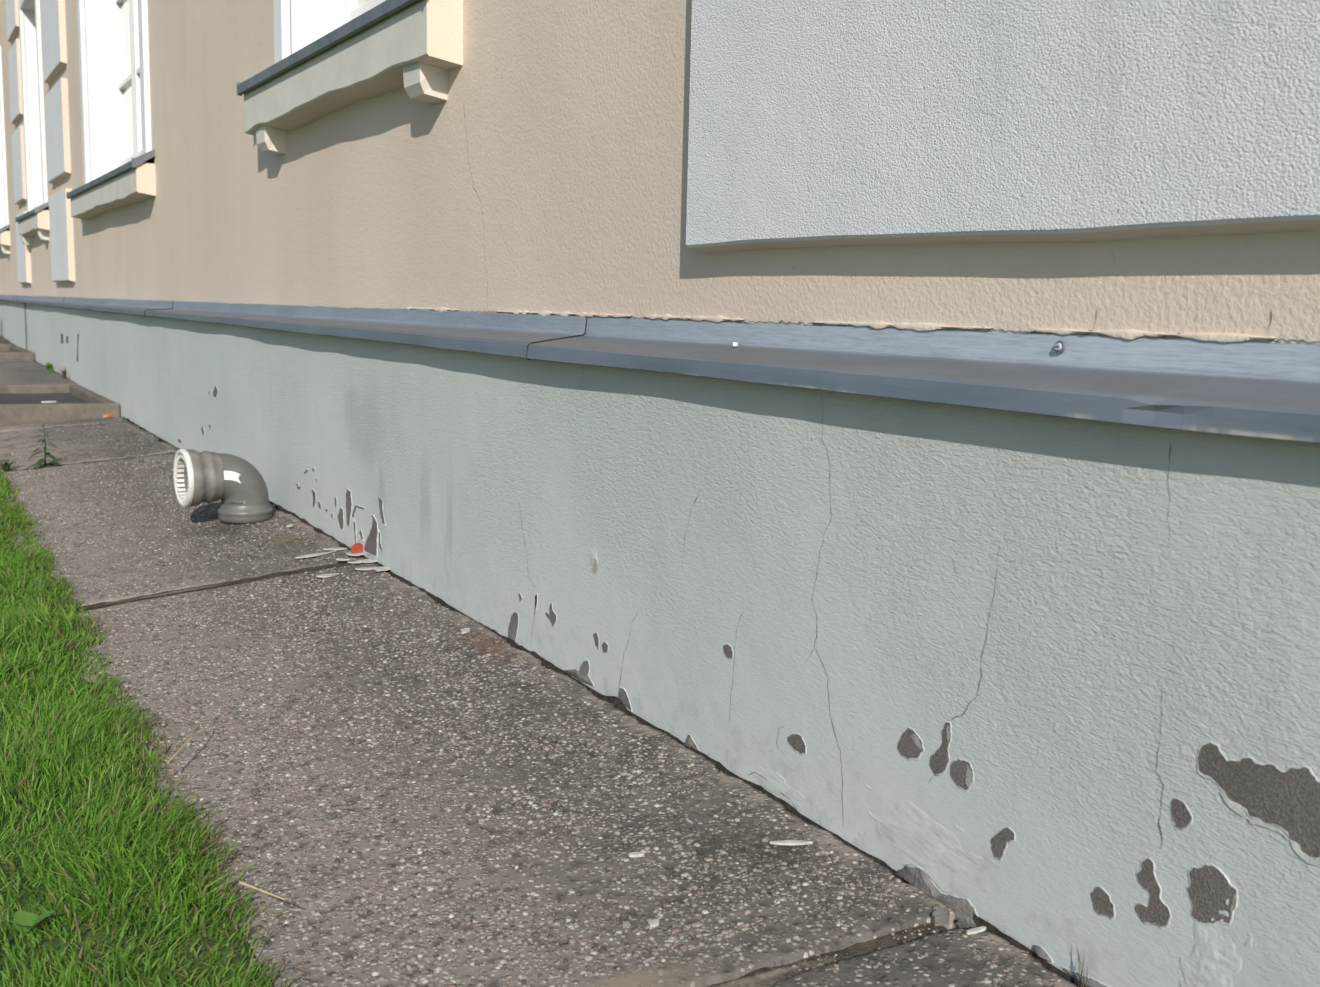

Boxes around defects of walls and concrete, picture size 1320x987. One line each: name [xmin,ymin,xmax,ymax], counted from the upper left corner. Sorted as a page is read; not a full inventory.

peeling [295,467,386,558]
peeling [508,593,557,648]
spalling [564,632,609,687]
crack [951,545,1000,720]
peeling [787,733,807,756]
peeling [897,721,974,793]
crack [1155,684,1164,851]
peeling [1196,740,1320,866]
peeling [990,826,1016,861]
peeling [1090,885,1116,920]
peeling [1134,857,1172,930]
peeling [1186,863,1238,927]